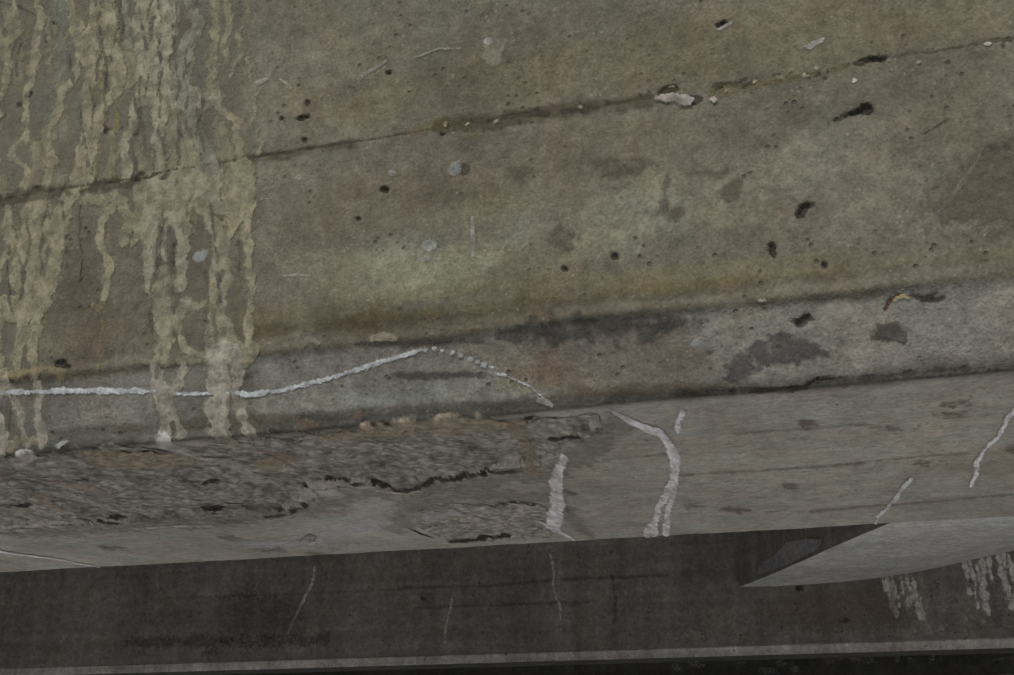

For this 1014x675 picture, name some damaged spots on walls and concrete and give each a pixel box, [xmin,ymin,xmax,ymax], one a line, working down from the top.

crack [843,37,1014,66]
crack [709,70,820,96]
crack [0,96,653,203]
leakage [0,0,262,456]
leakage [725,332,829,382]
spalling [0,398,605,535]
spalling [410,500,558,543]
efflorescence [881,573,944,632]
efflorescence [962,553,1014,625]